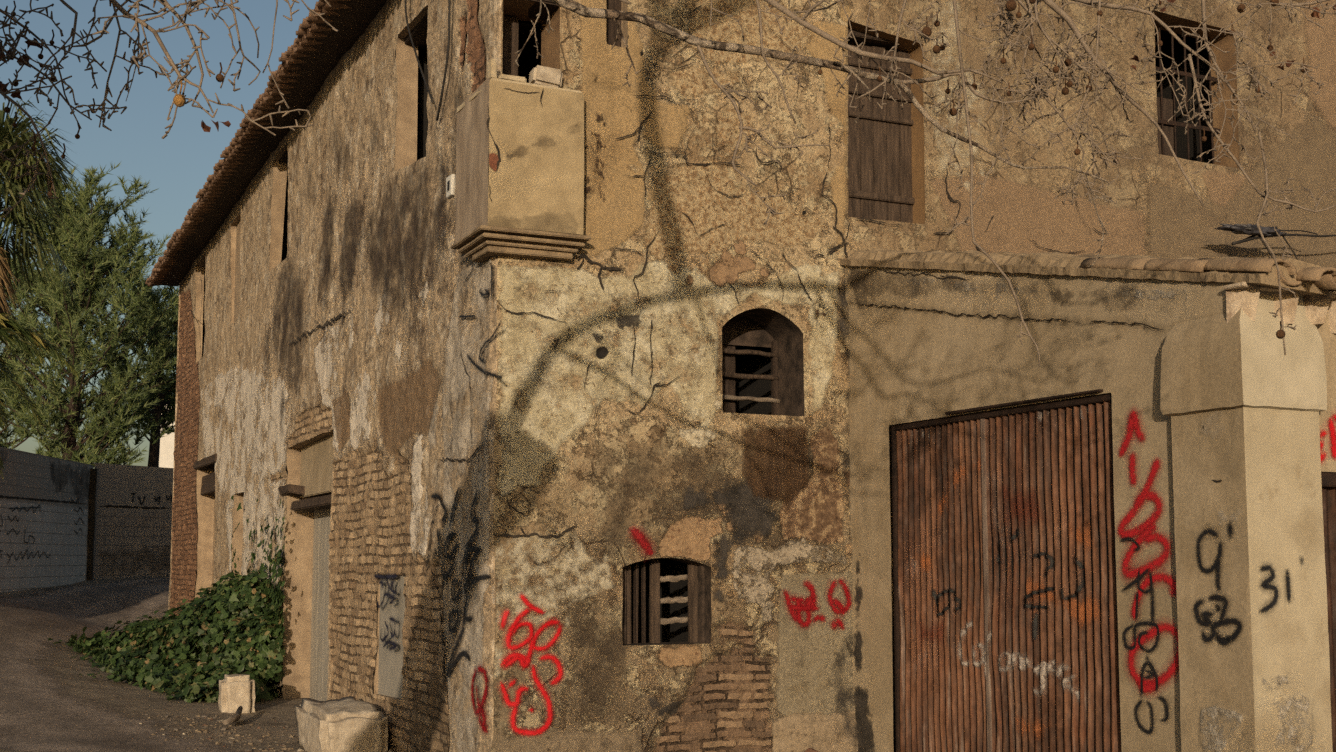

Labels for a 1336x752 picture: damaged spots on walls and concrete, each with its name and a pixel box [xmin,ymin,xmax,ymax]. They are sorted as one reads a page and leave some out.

water stain [318,166,447,305]
crack [498,57,782,414]
crack [751,124,1163,330]
water stain [265,267,305,387]
flaking render [170,0,854,752]
water stain [614,426,814,601]
corrosion [1026,580,1099,625]